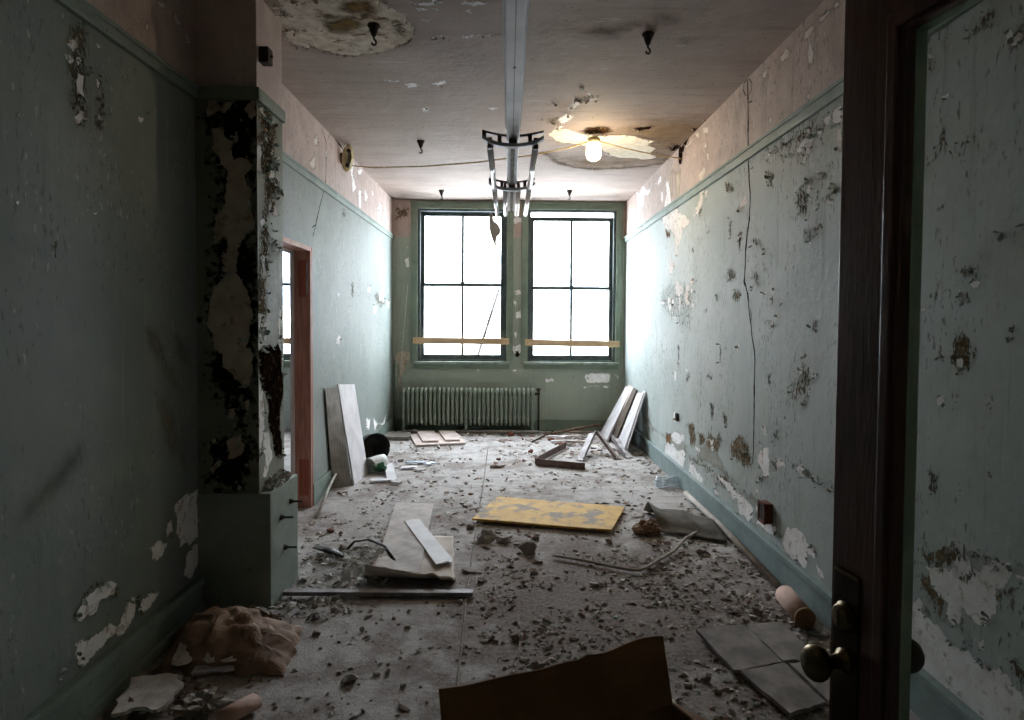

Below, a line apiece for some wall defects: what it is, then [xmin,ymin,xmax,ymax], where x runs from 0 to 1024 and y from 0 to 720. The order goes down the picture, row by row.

leakage [324,1,374,31]
peeling [202,100,287,481]
leakage [544,153,626,170]
peeling [541,87,656,159]
peeling [636,124,709,325]
crack [743,79,755,464]
peeling [751,106,843,244]
peeling [583,373,618,389]
peeling [150,489,200,579]
peeling [664,404,833,582]
peeling [59,581,159,681]
peeling [912,546,1024,720]